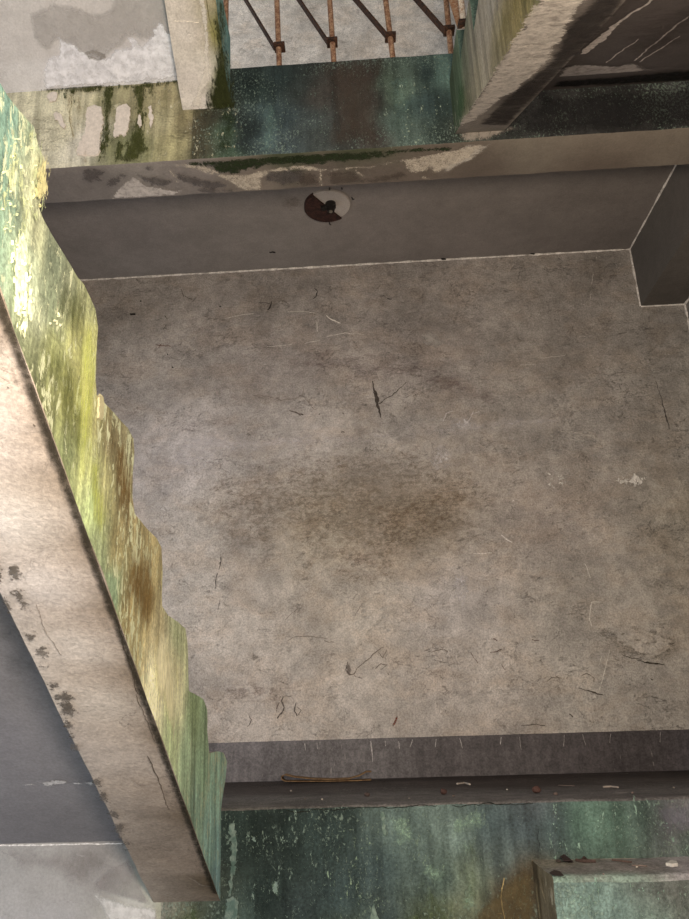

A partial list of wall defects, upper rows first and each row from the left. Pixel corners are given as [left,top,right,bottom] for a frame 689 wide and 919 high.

water stain [45,23,177,89]
water stain [402,0,583,178]
water stain [559,64,643,77]
crack [581,0,689,63]
peeling [76,104,154,157]
peeling [2,129,51,339]
water stain [0,566,30,615]
water stain [25,634,49,668]
water stain [47,682,80,751]